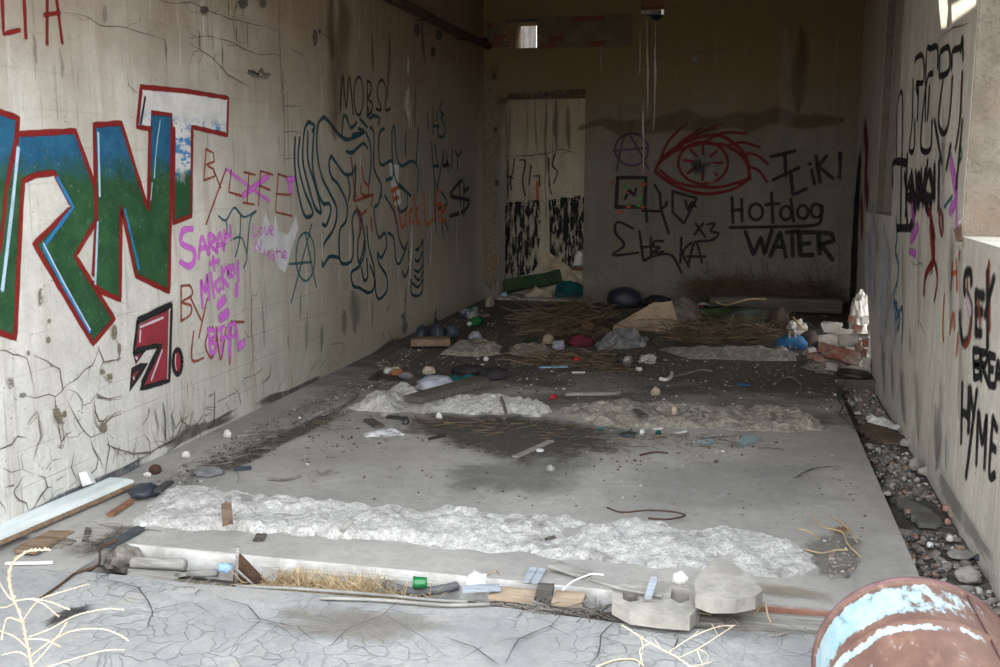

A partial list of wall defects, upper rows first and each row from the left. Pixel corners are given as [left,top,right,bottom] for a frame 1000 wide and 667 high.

crack [65,0,333,159]
crack [0,277,346,513]
crack [100,578,569,665]
crack [588,620,718,666]